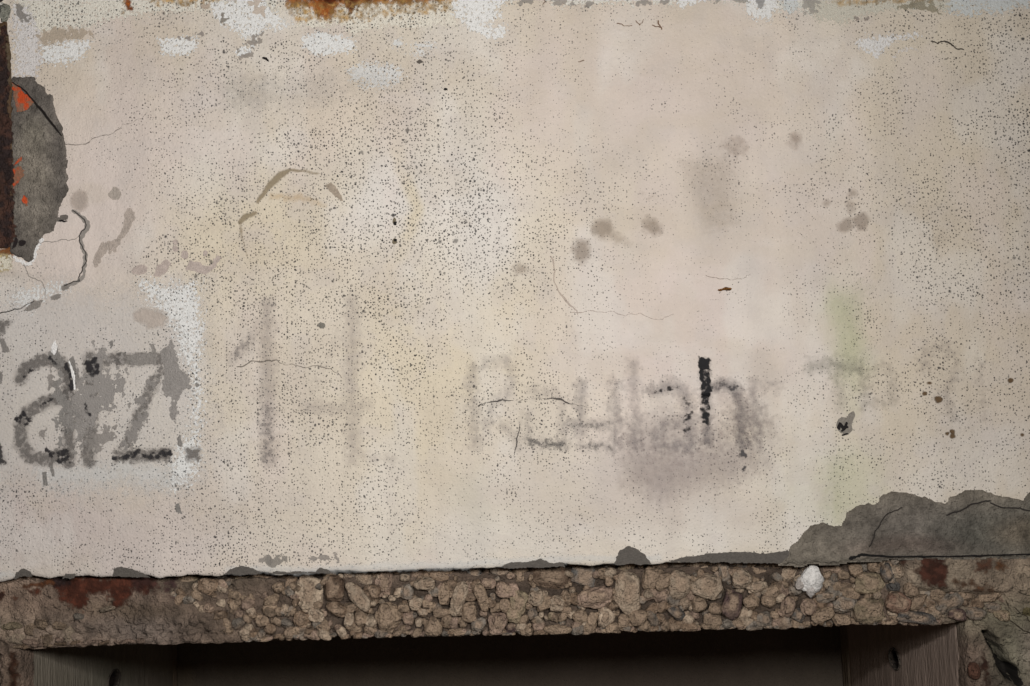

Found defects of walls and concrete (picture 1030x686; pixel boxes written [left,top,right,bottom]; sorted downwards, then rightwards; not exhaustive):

corrosion [286,0,448,22]
corrosion [0,25,17,271]
spalling [9,0,1030,266]
crack [0,209,90,314]
spalling [14,568,32,579]
corrosion [23,575,178,609]
spalling [113,567,150,578]
spalling [169,490,1030,642]
spalling [0,613,145,650]